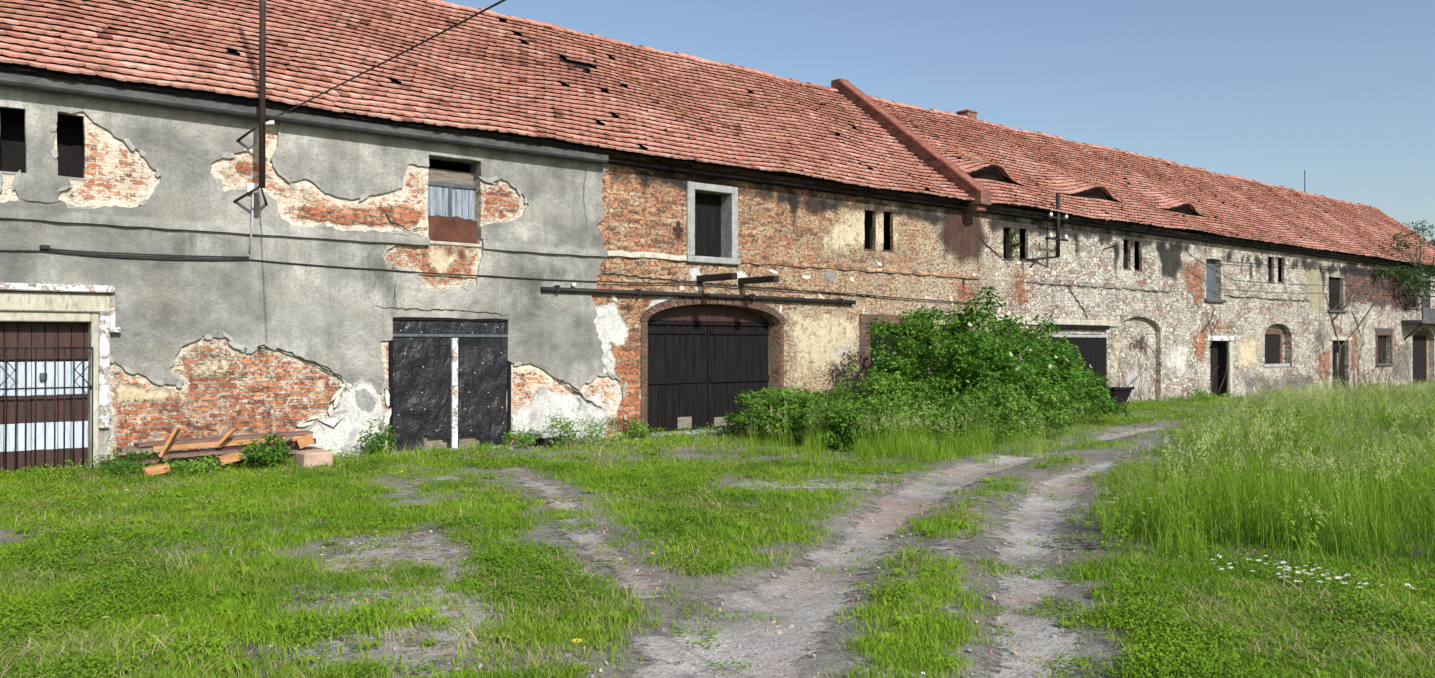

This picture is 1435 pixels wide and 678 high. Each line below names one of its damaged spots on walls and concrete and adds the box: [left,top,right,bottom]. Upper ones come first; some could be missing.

flaking render [0,170,21,203]
flaking render [50,112,160,210]
flaking render [209,123,528,291]
peeling [821,197,906,266]
peeling [779,275,868,398]
flaking render [102,332,392,467]